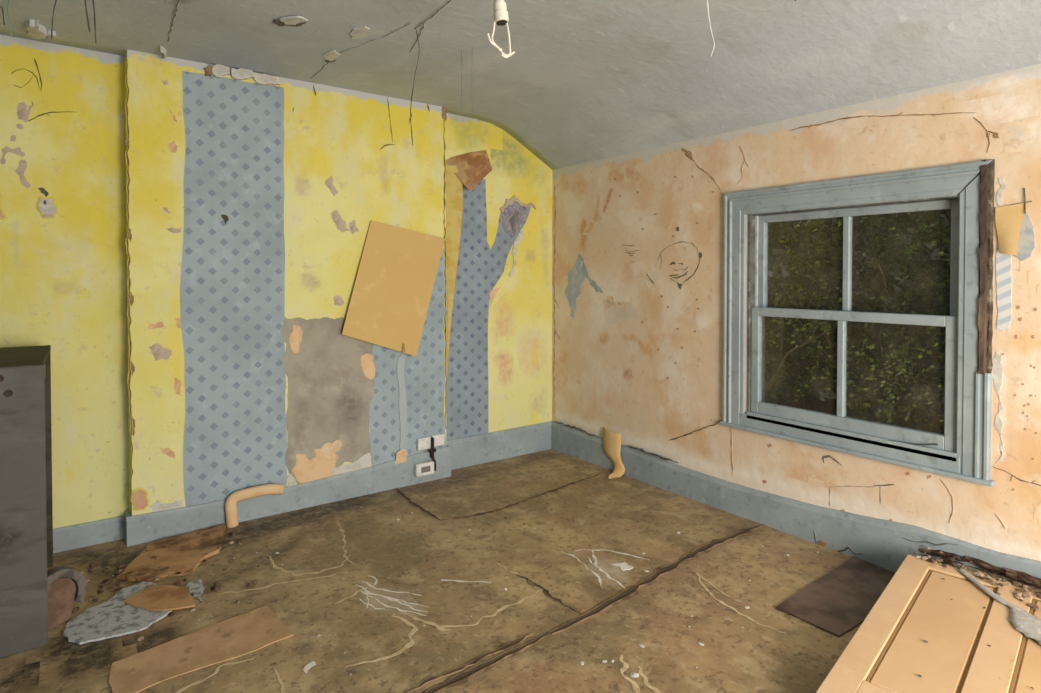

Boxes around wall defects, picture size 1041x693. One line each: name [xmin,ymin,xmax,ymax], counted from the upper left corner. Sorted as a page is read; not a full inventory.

peeling [11,58,43,89]
crack [293,0,452,111]
peeling [0,102,70,219]
crack [788,112,999,153]
peeling [331,210,359,234]
peeling [565,254,669,340]
flaking render [281,267,375,487]
peeling [991,332,1038,463]
crack [394,473,602,521]
crack [992,466,1041,486]
crack [330,514,782,693]